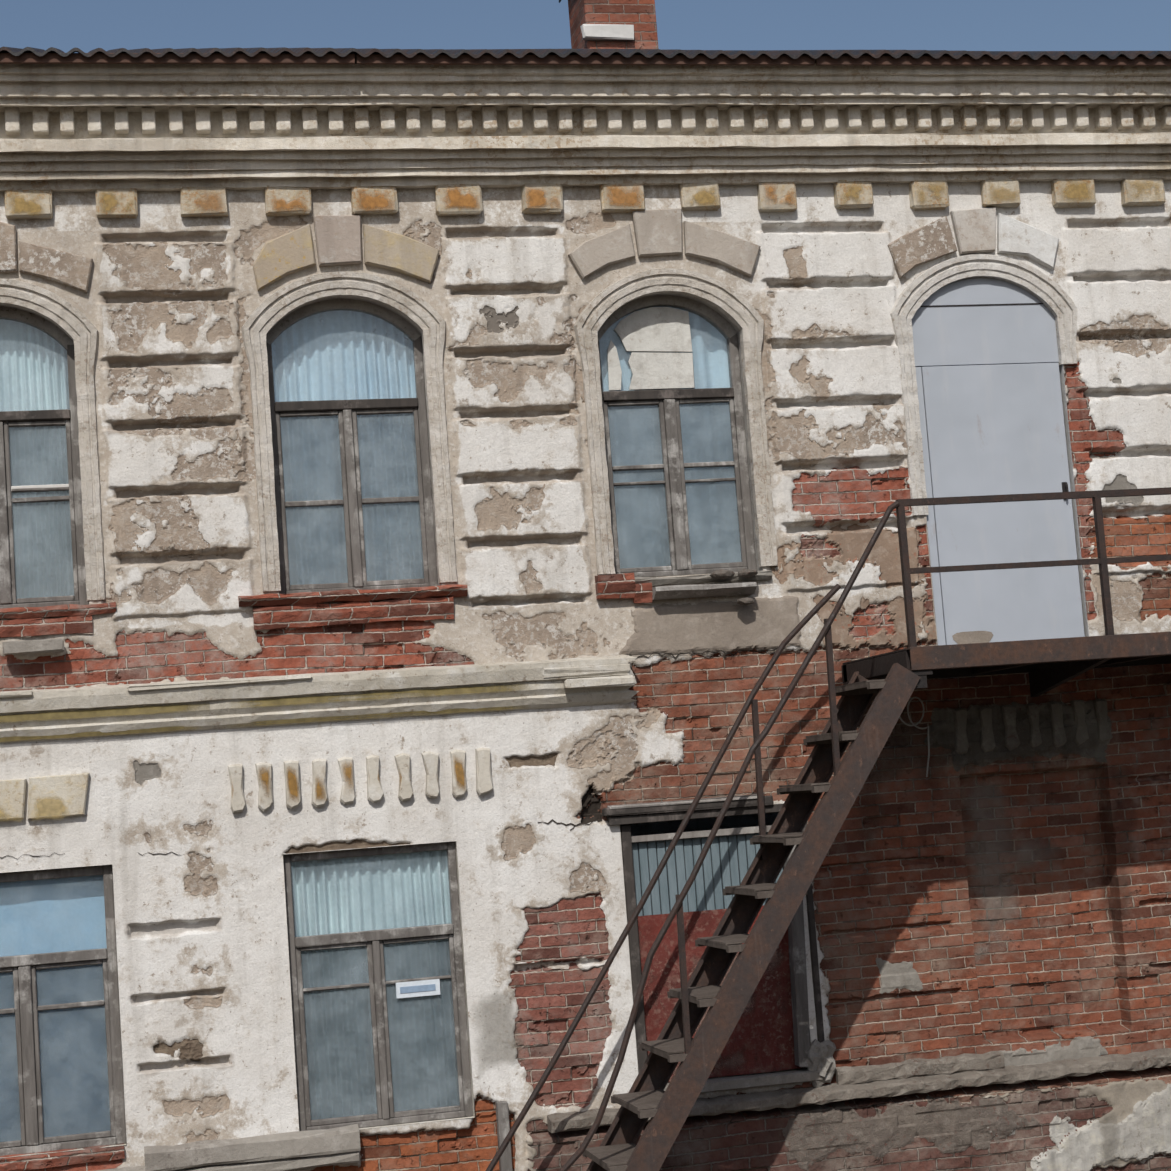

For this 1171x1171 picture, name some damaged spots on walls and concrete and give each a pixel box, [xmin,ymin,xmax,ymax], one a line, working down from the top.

peeling [1077,314,1171,358]
peeling [102,215,308,606]
peeling [474,484,545,531]
spalling [1065,361,1171,623]
spalling [506,309,937,825]
spalling [0,621,474,692]
peeling [482,611,611,662]
peeling [183,820,218,897]
spalling [781,664,1171,1089]
spalling [153,1039,203,1062]
spalling [311,862,612,1171]
spalling [659,1066,1171,1171]